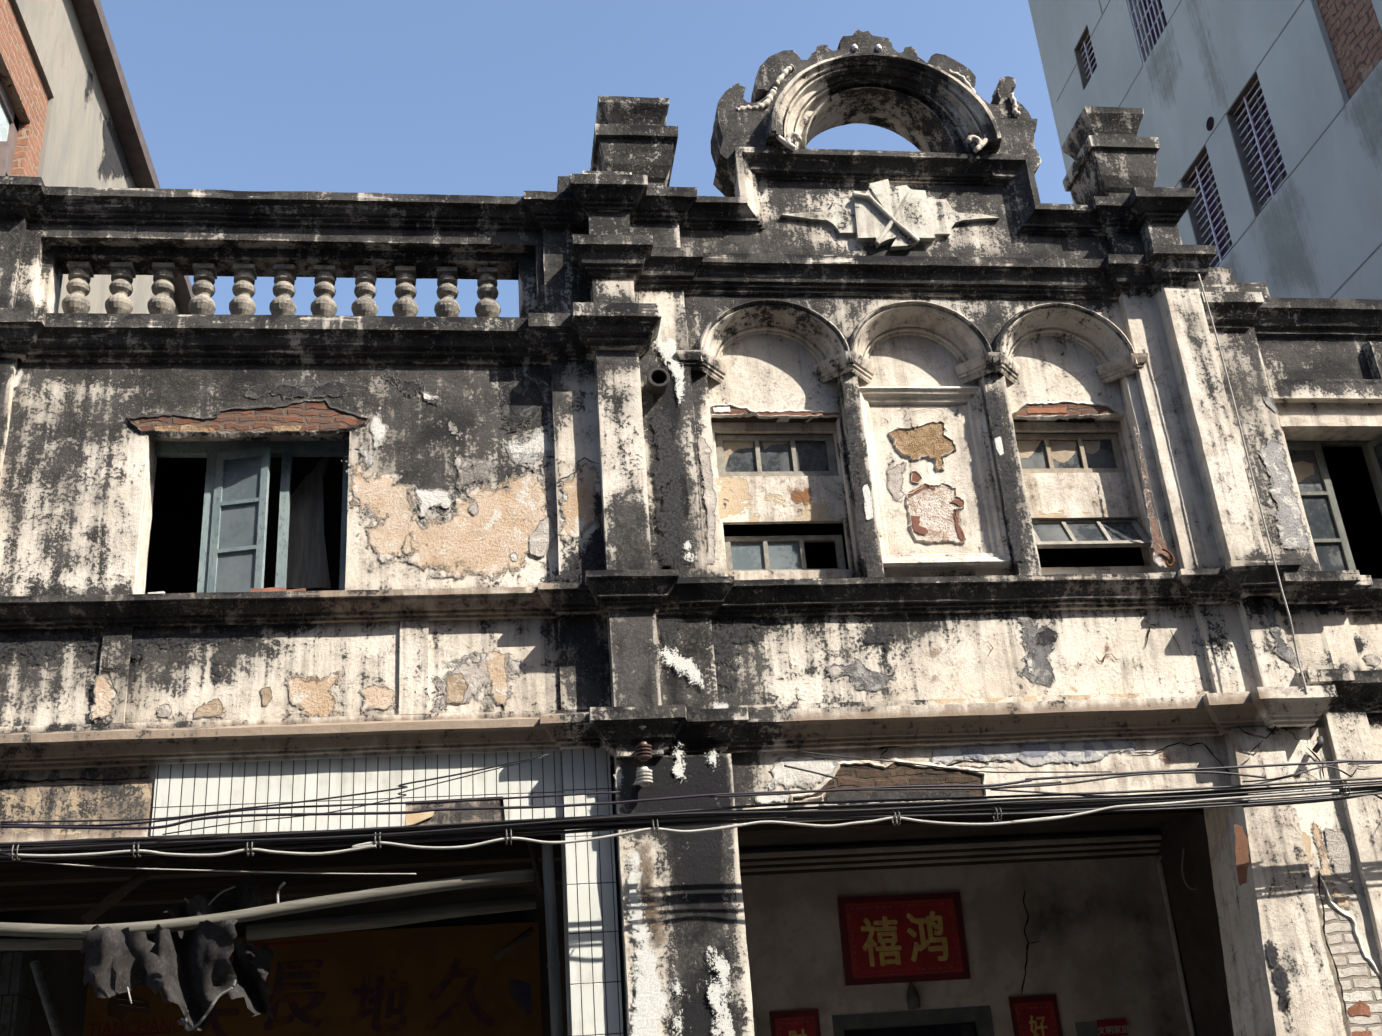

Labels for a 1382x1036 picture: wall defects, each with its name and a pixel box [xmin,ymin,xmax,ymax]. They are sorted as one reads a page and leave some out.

flaking render [126,366,602,582]
damp [649,408,687,577]
flaking render [886,421,967,545]
flaking render [90,675,118,720]
flaking render [429,650,524,714]
damp [656,614,685,667]
flaking render [755,739,1139,809]
flaking render [1016,612,1059,693]
crack [1136,714,1373,780]
damp [640,843,667,944]
crack [1021,890,1040,994]
flaking render [1311,821,1382,1036]